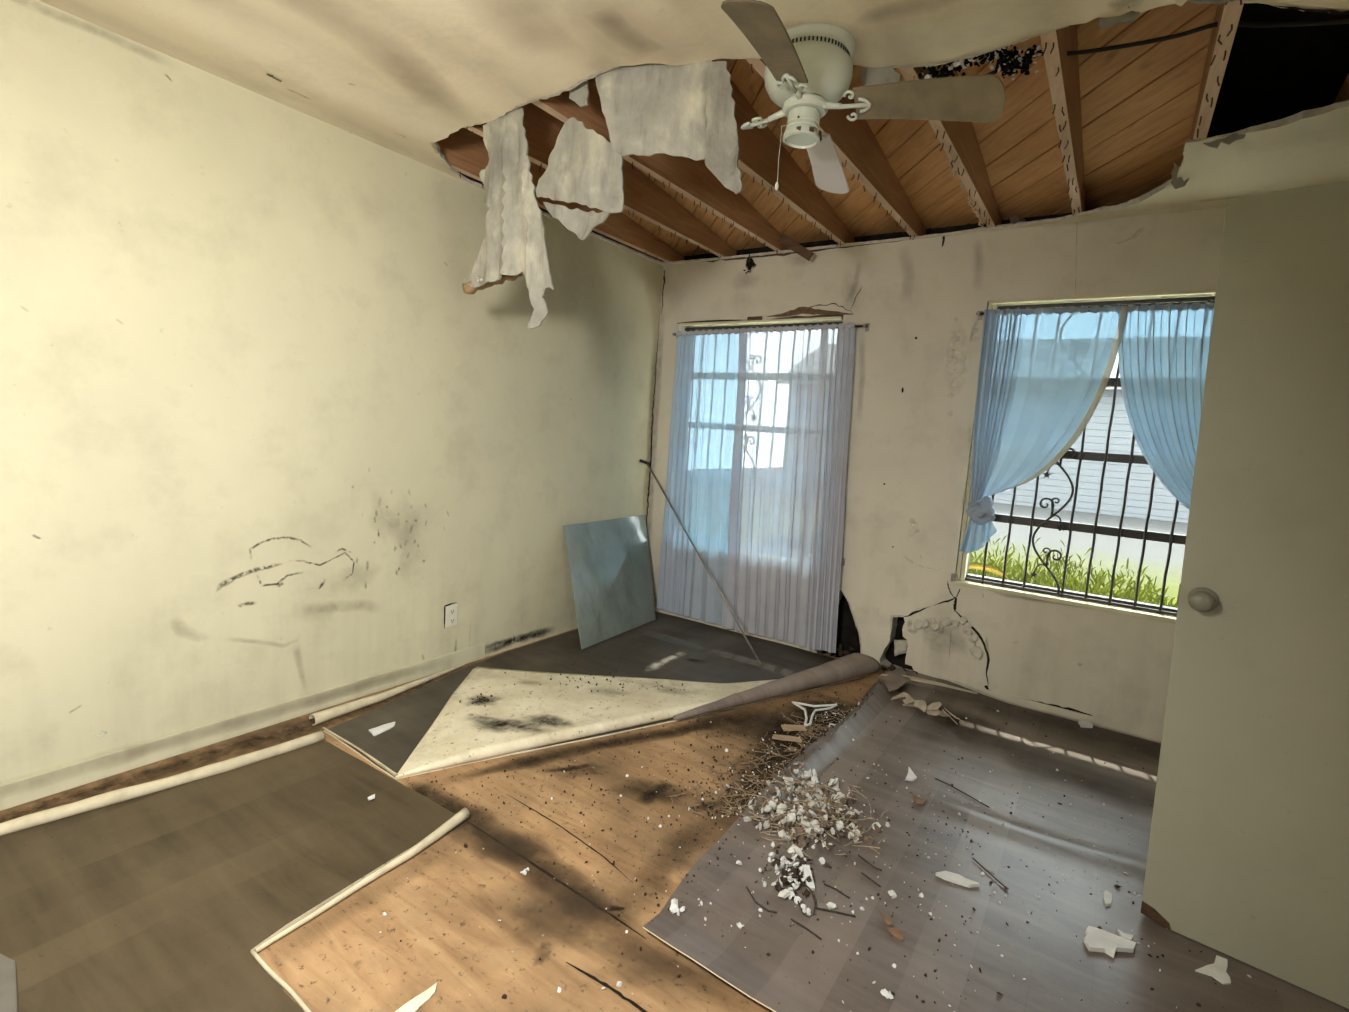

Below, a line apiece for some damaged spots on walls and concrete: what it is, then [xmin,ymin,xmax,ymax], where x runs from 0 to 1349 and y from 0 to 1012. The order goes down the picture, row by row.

peeling [922,45,1041,80]
spalling [677,287,862,324]
spalling [822,593,862,658]
crack [904,583,990,690]
crack [1031,700,1092,716]